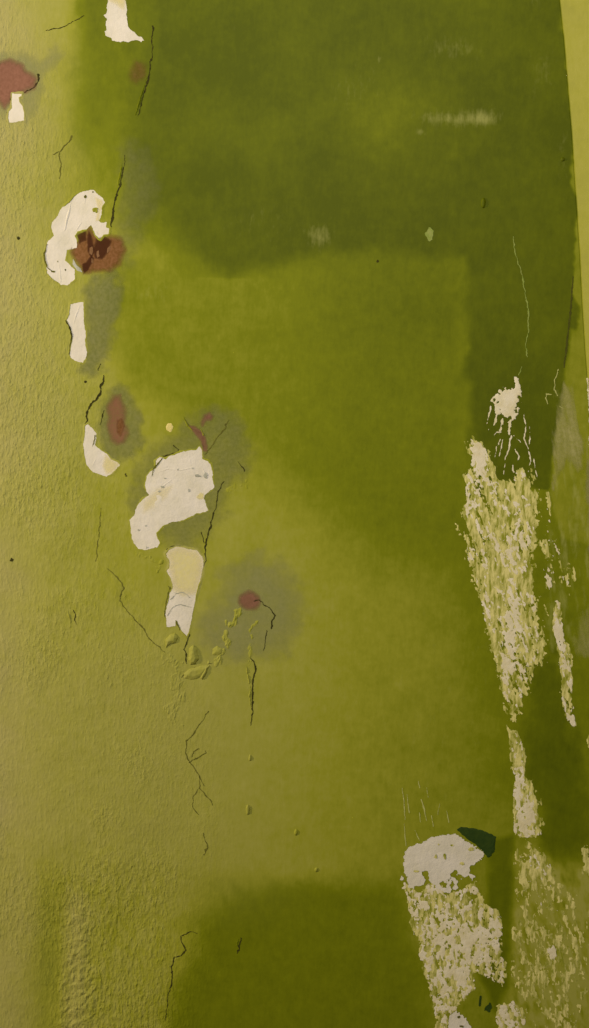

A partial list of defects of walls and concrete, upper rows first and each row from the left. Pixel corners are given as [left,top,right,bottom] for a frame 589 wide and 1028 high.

peeling [102,0,146,45]
corrosion [0,60,36,107]
crack [135,25,154,115]
peeling [41,186,112,289]
corrosion [71,229,125,272]
peeling [64,299,90,365]
leakage [86,277,119,371]
corrosion [108,397,127,443]
peeling [127,443,217,639]
peeling [400,377,589,1028]
crack [185,711,213,855]
crack [165,931,195,1020]